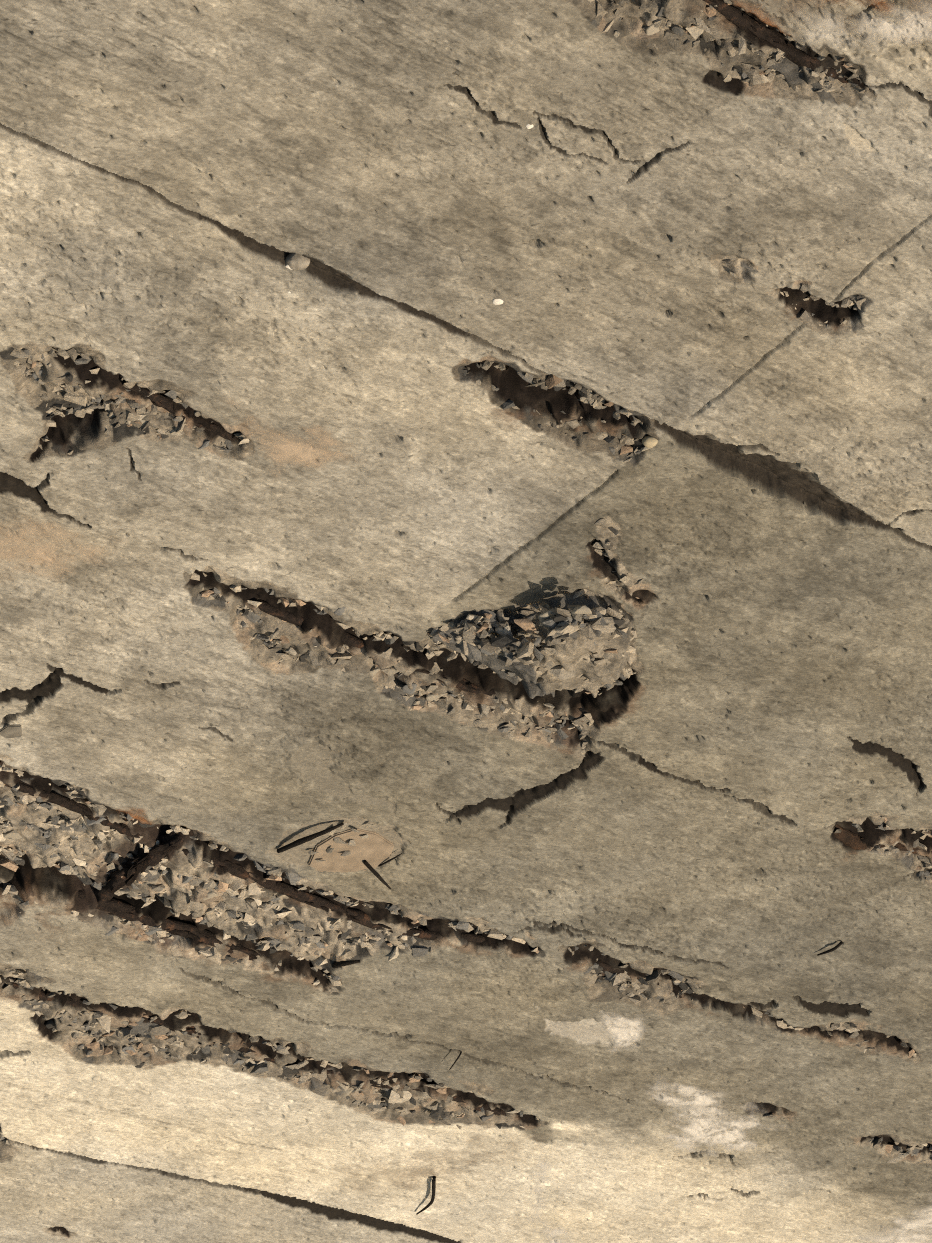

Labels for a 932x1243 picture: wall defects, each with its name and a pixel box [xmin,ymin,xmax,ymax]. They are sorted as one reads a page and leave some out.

crack [443,84,691,186]
spalling [562,0,877,107]
crack [863,81,932,120]
crack [0,471,92,531]
spalling [0,341,255,464]
crack [125,448,142,481]
spalling [451,355,659,467]
spalling [183,516,657,761]
crack [435,735,797,829]
crack [847,736,927,797]
spalling [0,753,932,1064]
spalling [0,963,548,1131]